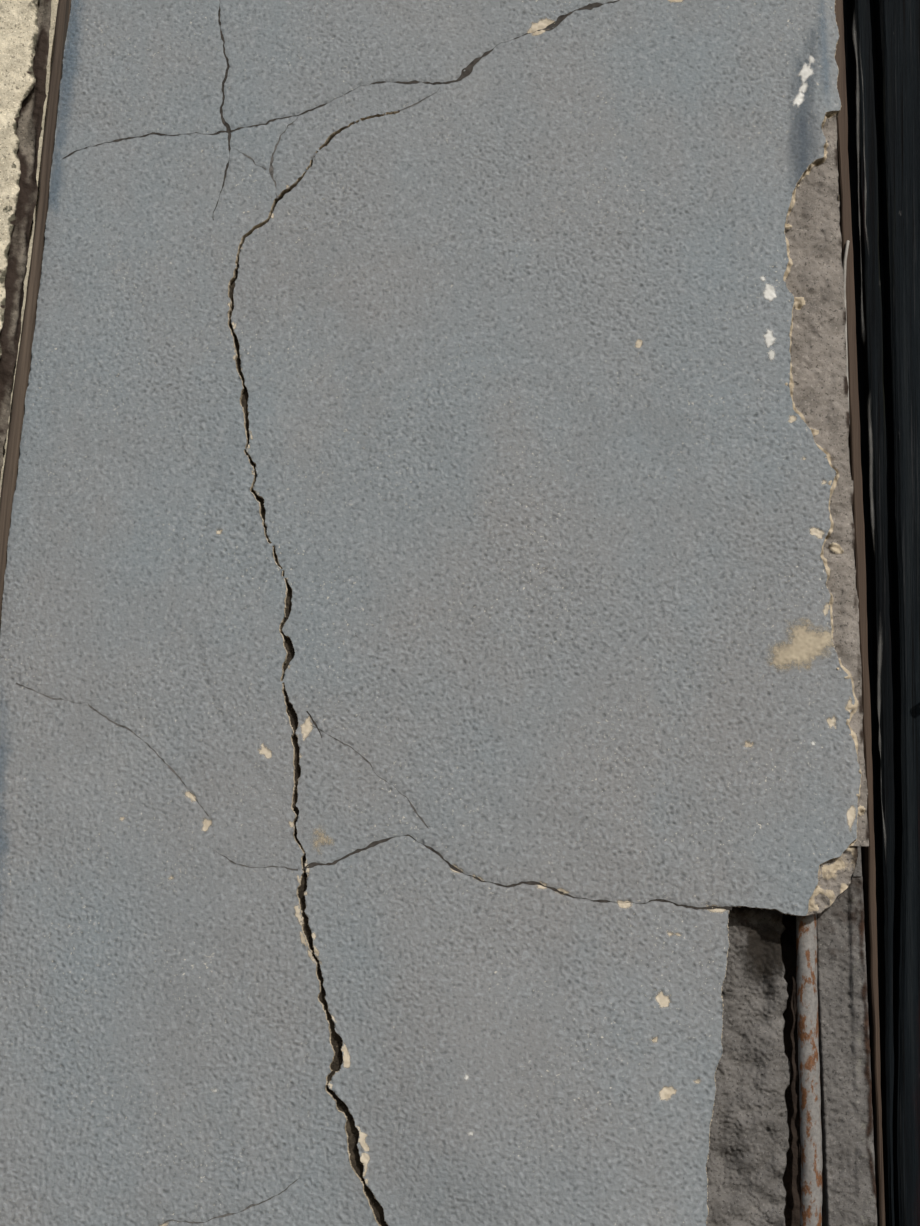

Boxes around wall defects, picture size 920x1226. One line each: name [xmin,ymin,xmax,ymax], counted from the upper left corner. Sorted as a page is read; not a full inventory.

crack [16,683,209,817]
crack [62,0,732,1226]
spalling [783,112,870,846]
spalling [656,992,670,1008]
spalling [659,1087,676,1100]
spalling [706,876,877,1226]